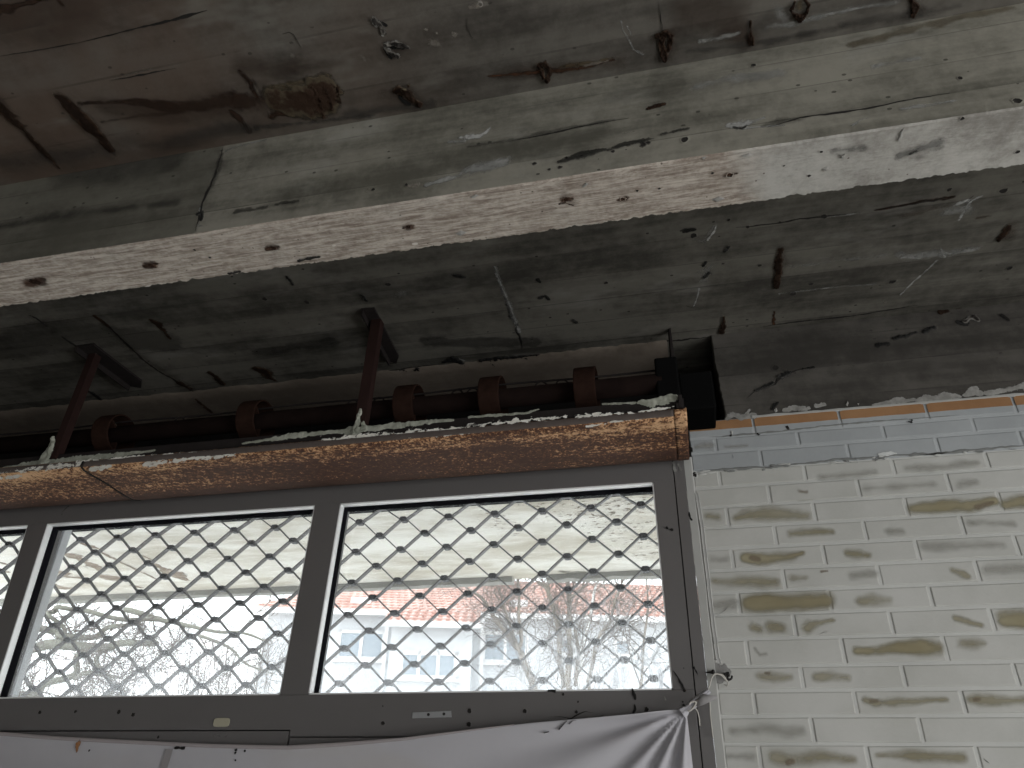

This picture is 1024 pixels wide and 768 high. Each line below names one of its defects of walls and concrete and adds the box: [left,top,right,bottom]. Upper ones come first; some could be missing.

spalling [238,69,344,121]
crack [195,139,266,227]
crack [746,366,815,399]
peeling [983,382,1024,396]